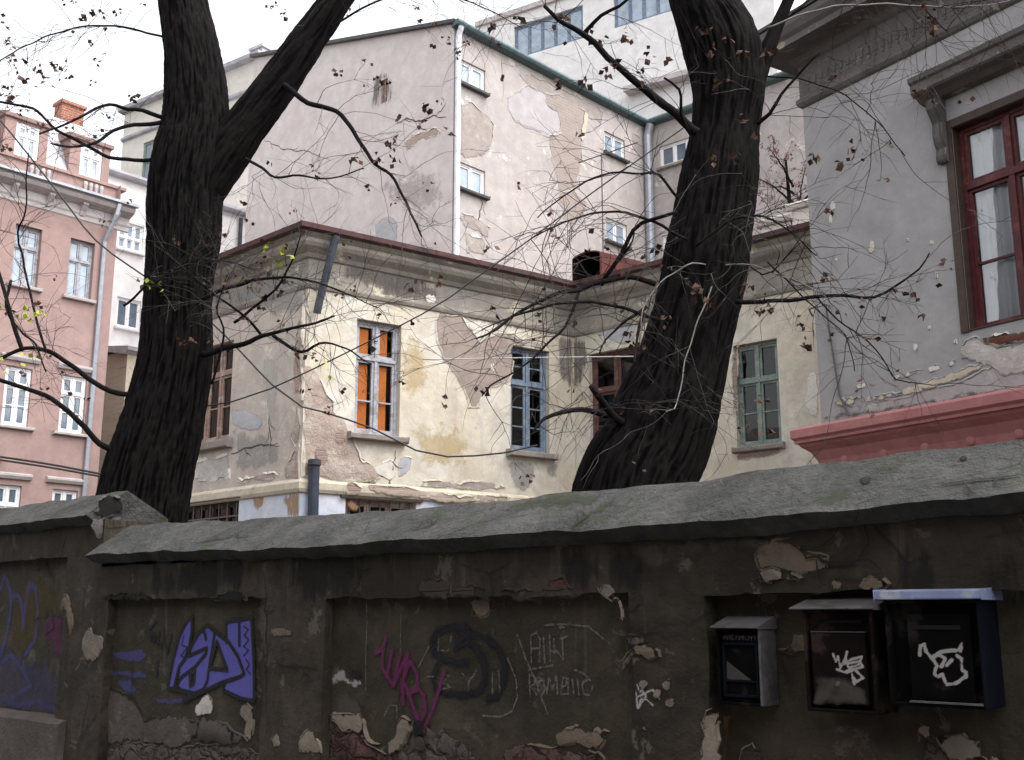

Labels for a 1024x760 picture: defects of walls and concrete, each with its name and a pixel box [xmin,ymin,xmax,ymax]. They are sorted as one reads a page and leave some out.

spalling [460,101,495,158]
spalling [508,74,603,223]
peeling [434,313,544,409]
peeling [835,332,1024,415]
spalling [194,304,508,503]
spalling [91,495,124,539]
peeling [754,537,829,584]
spalling [61,594,103,662]
spalling [298,712,480,760]
spalling [502,724,610,760]
peeling [700,708,722,760]
peeling [918,724,998,760]